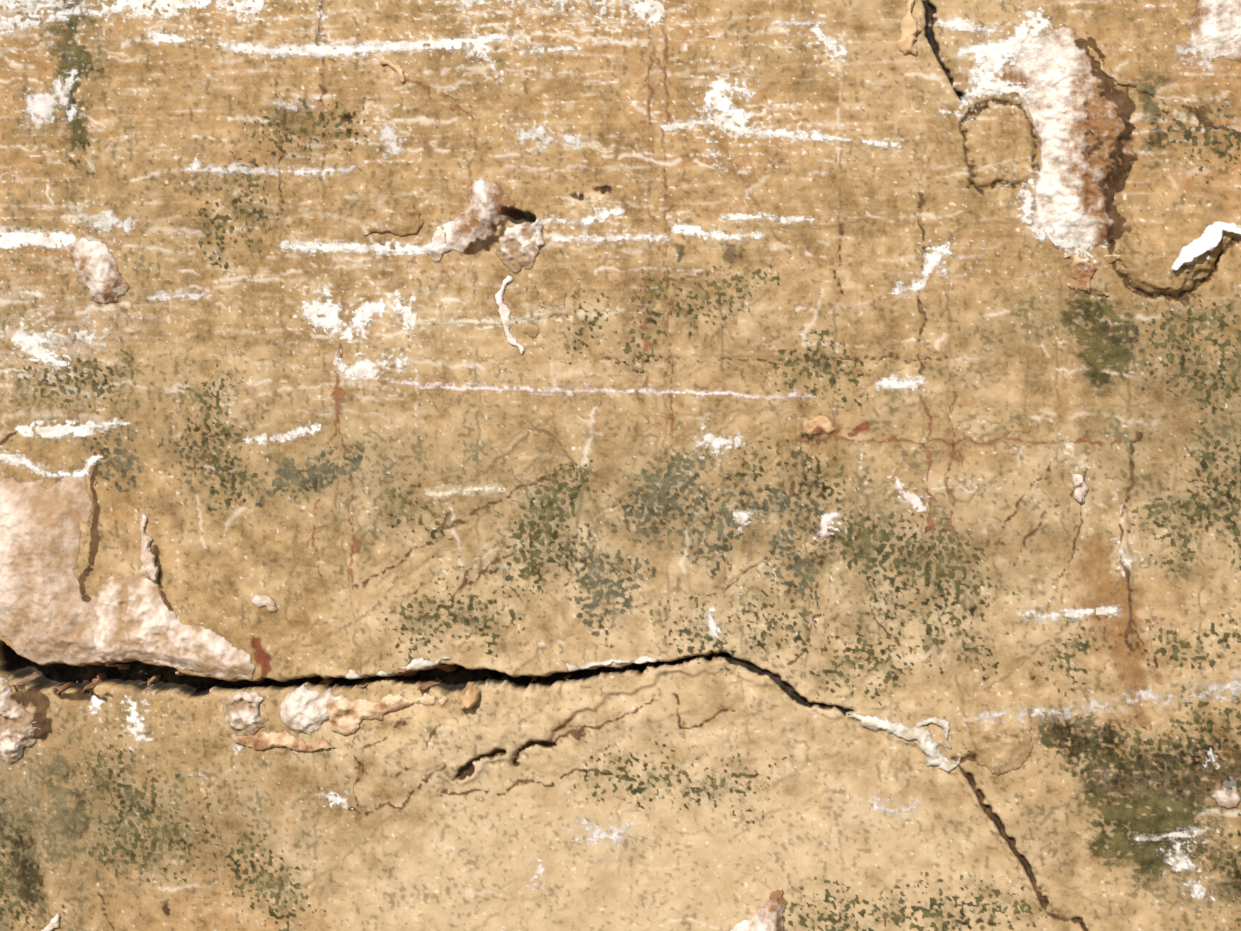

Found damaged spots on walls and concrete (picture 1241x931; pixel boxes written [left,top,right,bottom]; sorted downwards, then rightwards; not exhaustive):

crack [922,0,1040,194]
crack [1183,105,1241,137]
crack [1108,238,1239,301]
peeling [7,317,120,371]
rust [849,423,869,436]
peeling [139,515,159,582]
rust [1083,542,1147,702]
rust [252,638,271,679]
crack [2,579,854,816]
water stain [1038,712,1094,748]
crack [951,755,1088,931]
water stain [1077,772,1216,886]